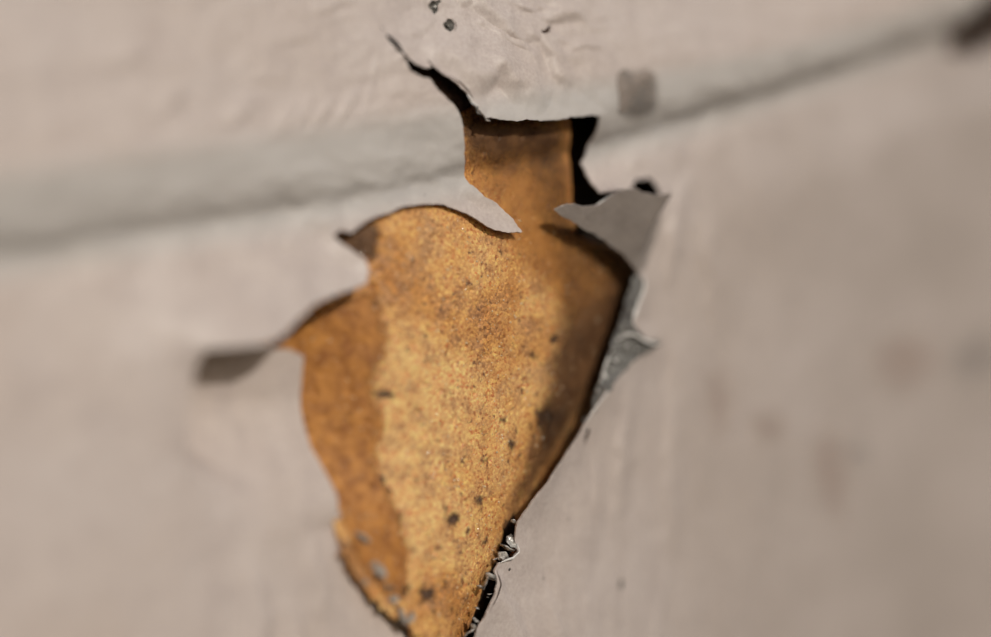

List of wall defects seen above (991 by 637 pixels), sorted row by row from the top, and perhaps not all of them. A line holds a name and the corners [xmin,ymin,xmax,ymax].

peeling [460,95,497,121]
peeling [188,115,672,637]